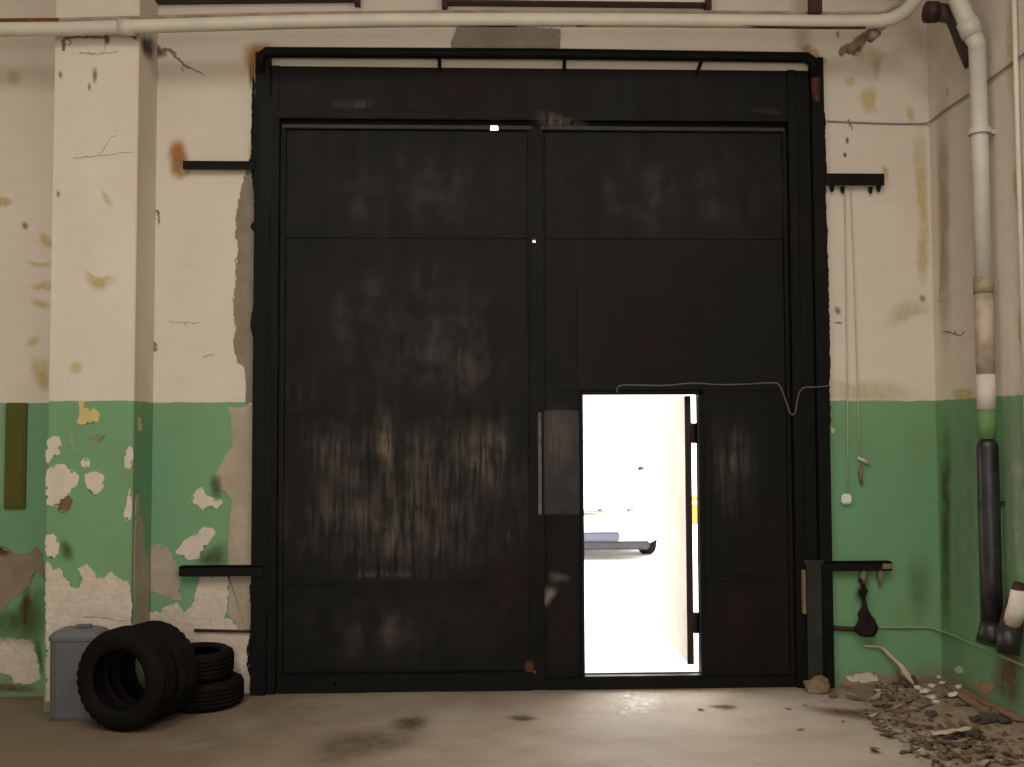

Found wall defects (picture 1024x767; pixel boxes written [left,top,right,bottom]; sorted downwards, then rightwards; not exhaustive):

crack [61,35,118,55]
flaking render [451,27,561,48]
crack [163,48,204,75]
rust [248,45,268,82]
crack [74,134,133,159]
rust [171,144,184,176]
flaking render [0,170,254,701]